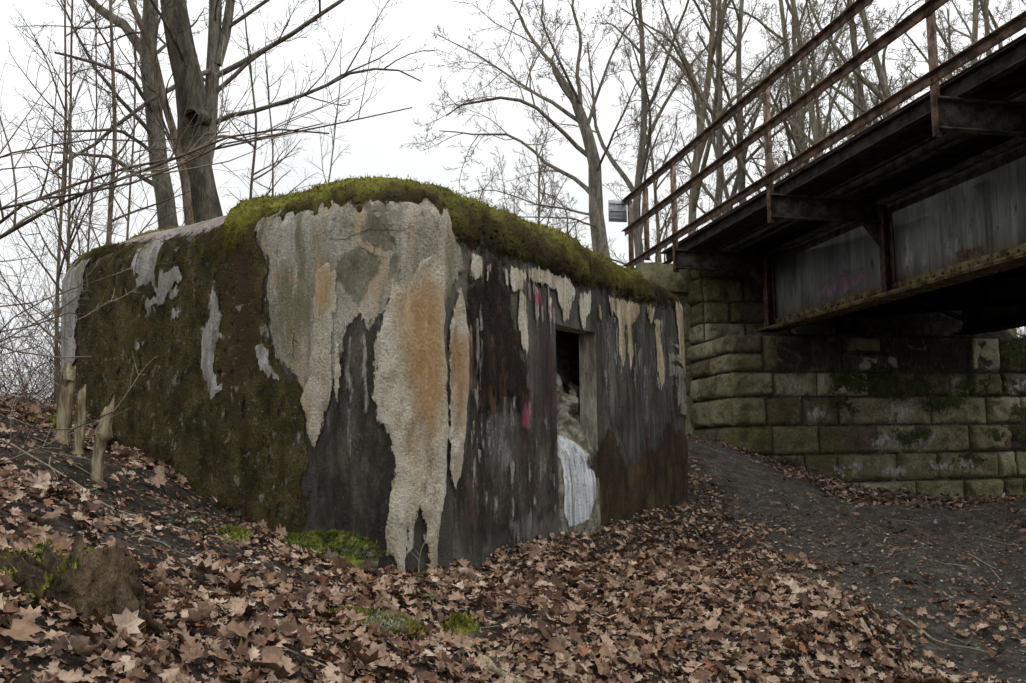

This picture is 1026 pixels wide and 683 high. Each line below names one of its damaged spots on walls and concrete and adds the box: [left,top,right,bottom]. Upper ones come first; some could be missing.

peeling [61,259,92,375]
peeling [115,215,227,322]
peeling [255,196,465,391]
water stain [300,252,688,573]